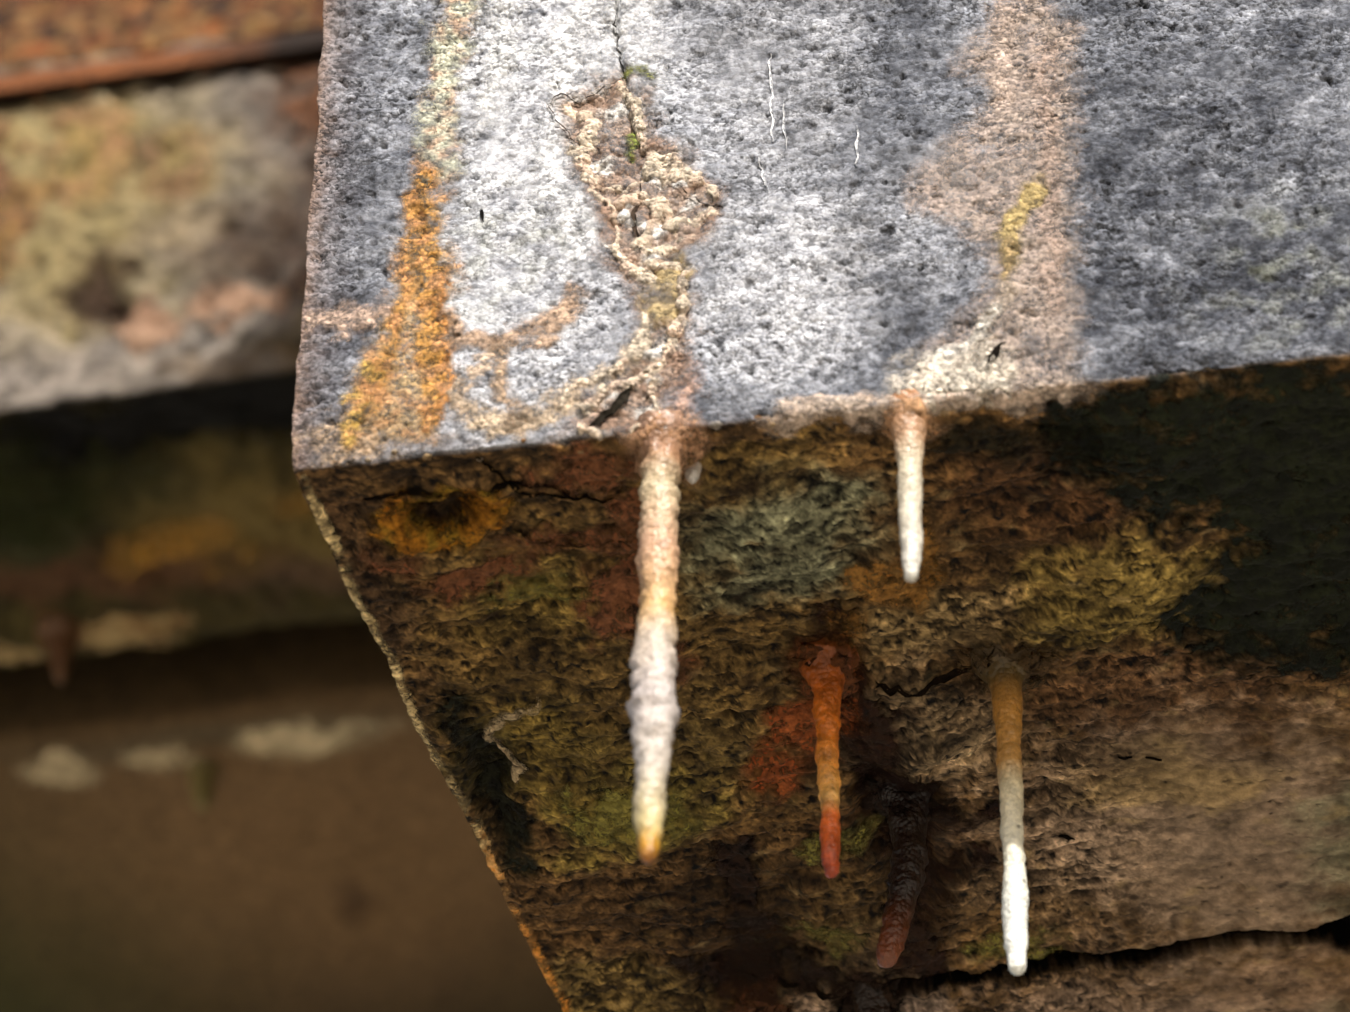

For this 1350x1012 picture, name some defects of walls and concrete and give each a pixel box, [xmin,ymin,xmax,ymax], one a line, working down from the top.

crack [546,0,646,158]
crack [670,182,723,209]
rust [341,160,461,448]
rust [363,440,642,646]
damp [773,304,1350,681]
rust [675,641,698,683]
rust [808,510,944,793]
rust [743,699,817,798]
crack [739,972,840,1001]
rust [668,800,1001,1008]
crack [896,915,1350,997]